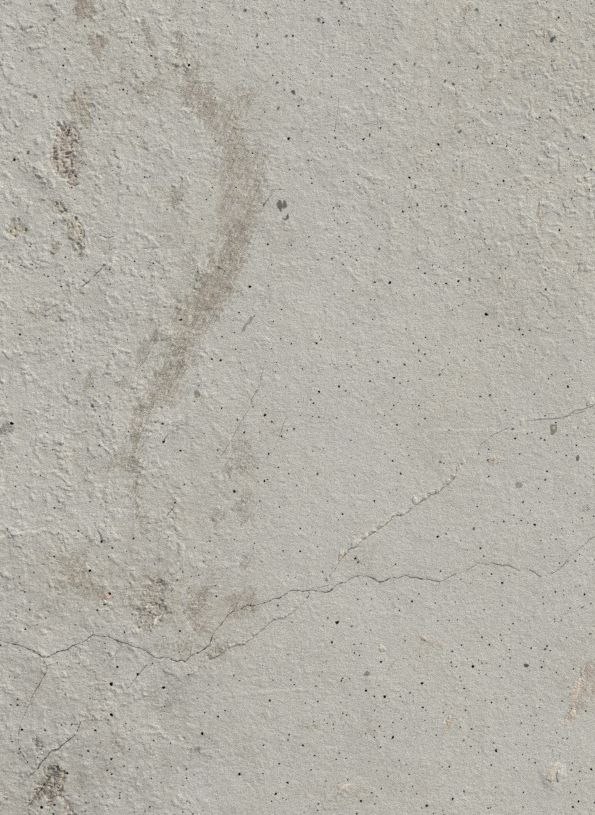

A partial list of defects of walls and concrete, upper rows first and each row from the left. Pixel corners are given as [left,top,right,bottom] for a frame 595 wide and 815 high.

spalling [49,122,79,188]
crack [11,397,594,783]